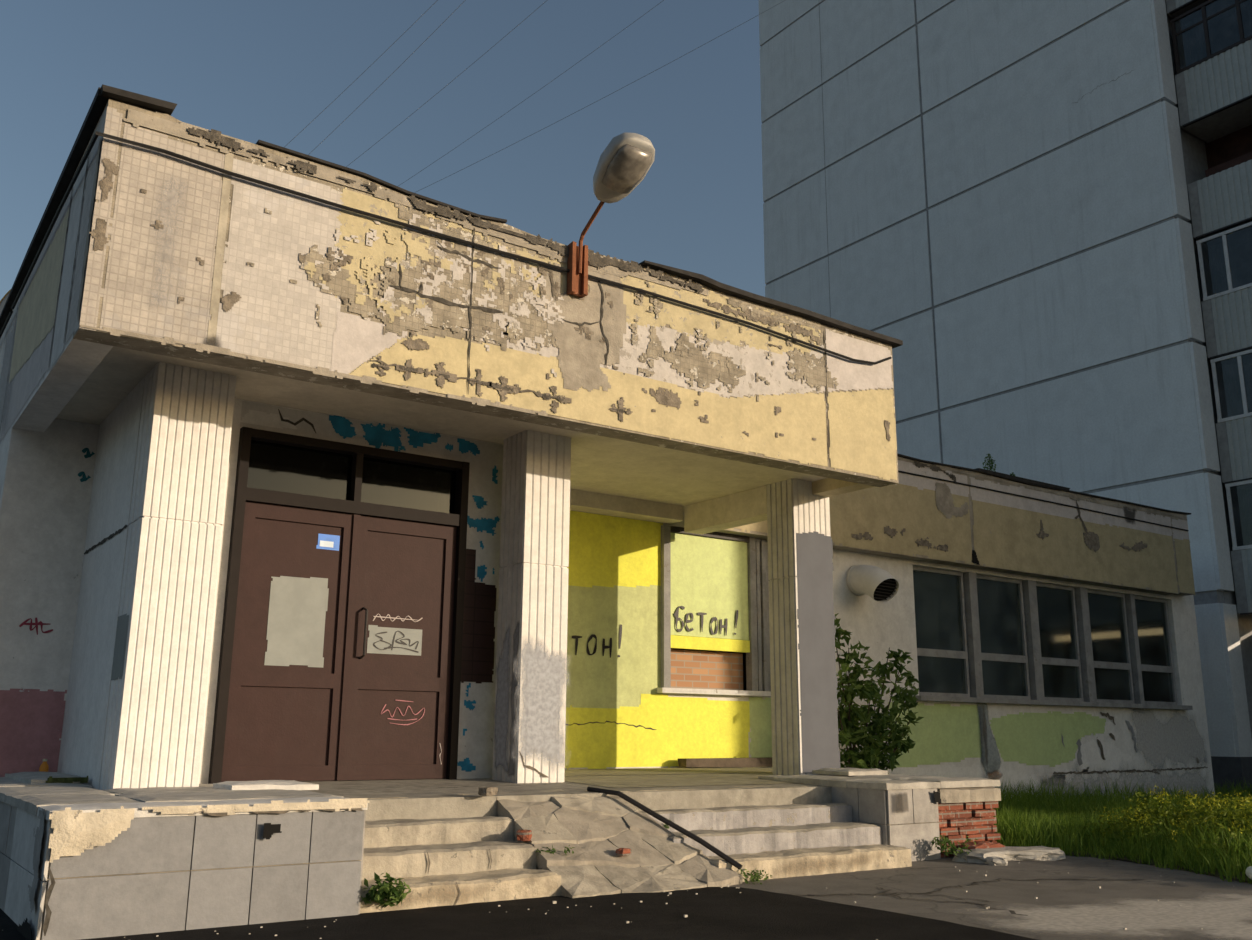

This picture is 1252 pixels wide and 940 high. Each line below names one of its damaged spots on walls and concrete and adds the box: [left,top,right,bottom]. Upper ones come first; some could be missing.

peeling [77,108,839,423]
crack [539,267,609,366]
spalling [897,458,1187,520]
peeling [1097,708,1145,760]
spalling [48,806,135,863]
crack [807,878,1144,916]
spalling [17,918,31,940]